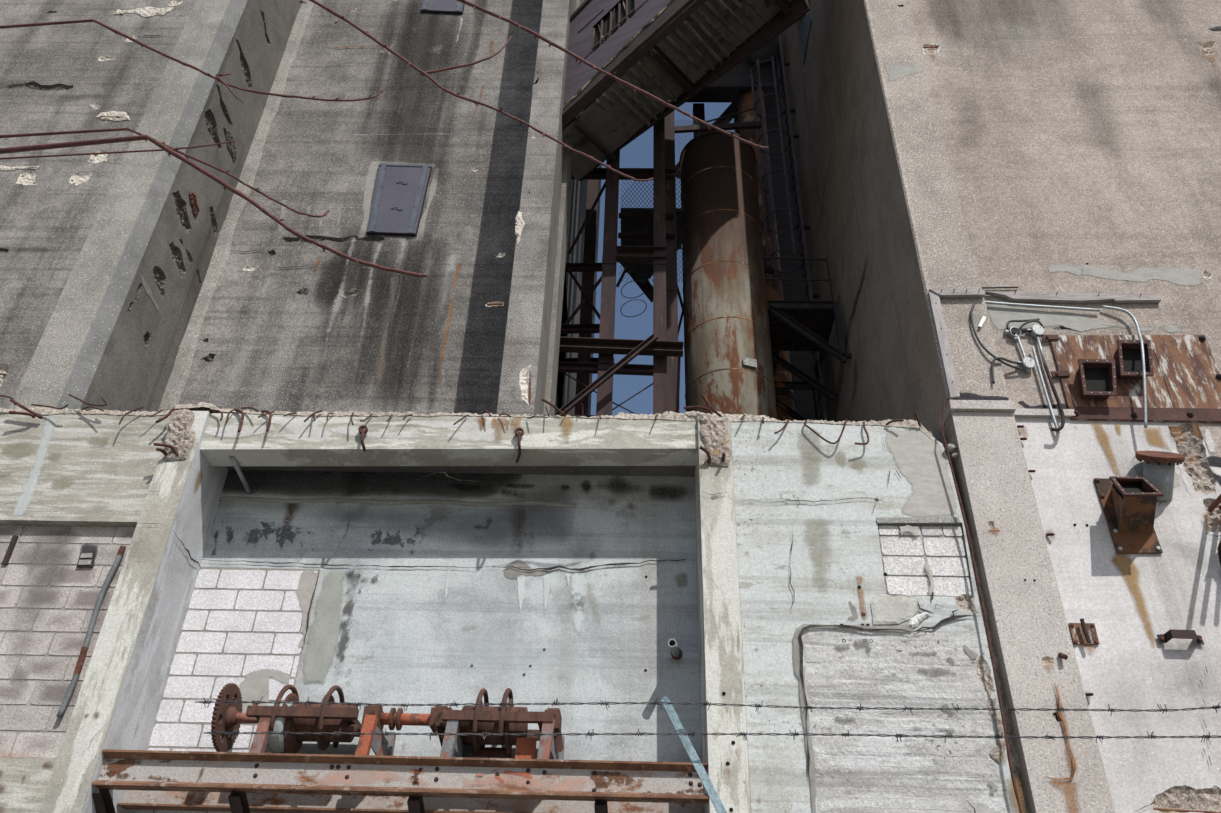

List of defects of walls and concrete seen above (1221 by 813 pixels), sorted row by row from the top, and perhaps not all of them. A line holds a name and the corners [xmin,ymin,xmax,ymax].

spalling [127,190,218,318]
leakage [317,0,485,402]
rust [1094,423,1120,473]
spalling [1168,422,1221,534]
leakage [213,522,314,554]
leakage [371,528,421,553]
crack [144,519,686,645]
spalling [0,364,1022,813]
crack [701,437,974,777]
rust [1112,554,1154,642]
rust [1054,711,1077,813]
spalling [1151,785,1221,813]